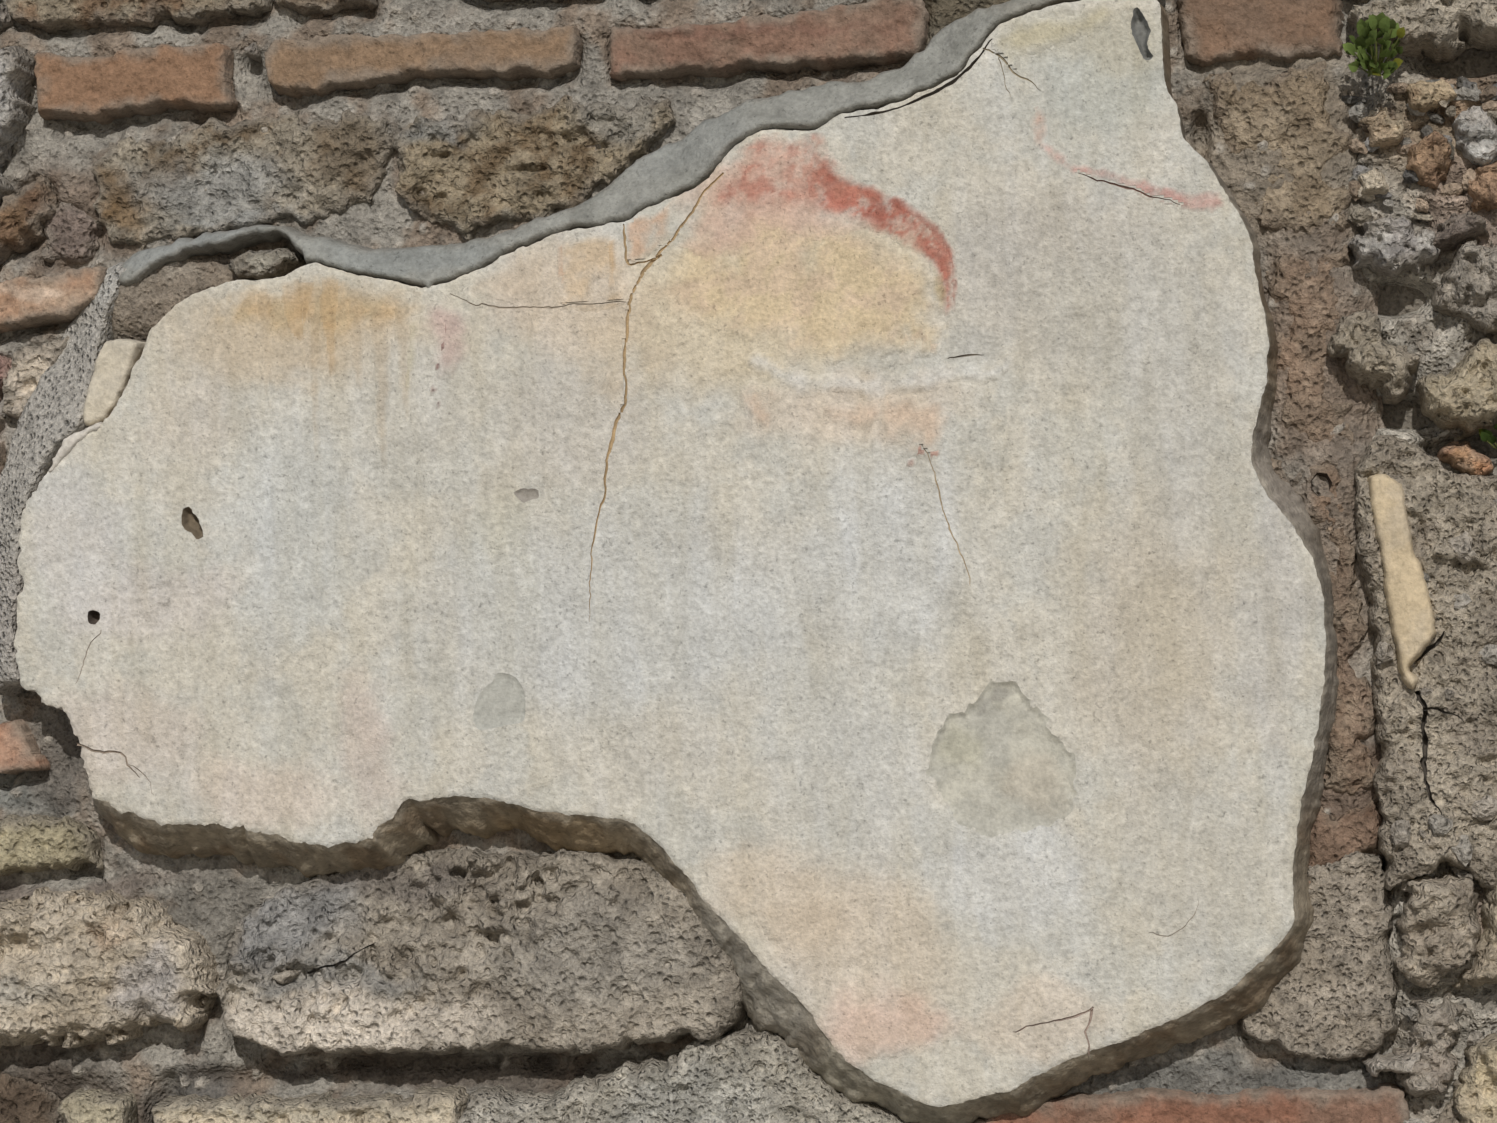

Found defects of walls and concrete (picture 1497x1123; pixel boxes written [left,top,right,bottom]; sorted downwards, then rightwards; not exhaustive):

crack [1079,173,1180,205]
crack [451,173,724,622]
crack [922,445,970,582]
crack [77,743,154,795]
crack [1414,631,1464,815]
crack [1015,1007,1094,1056]